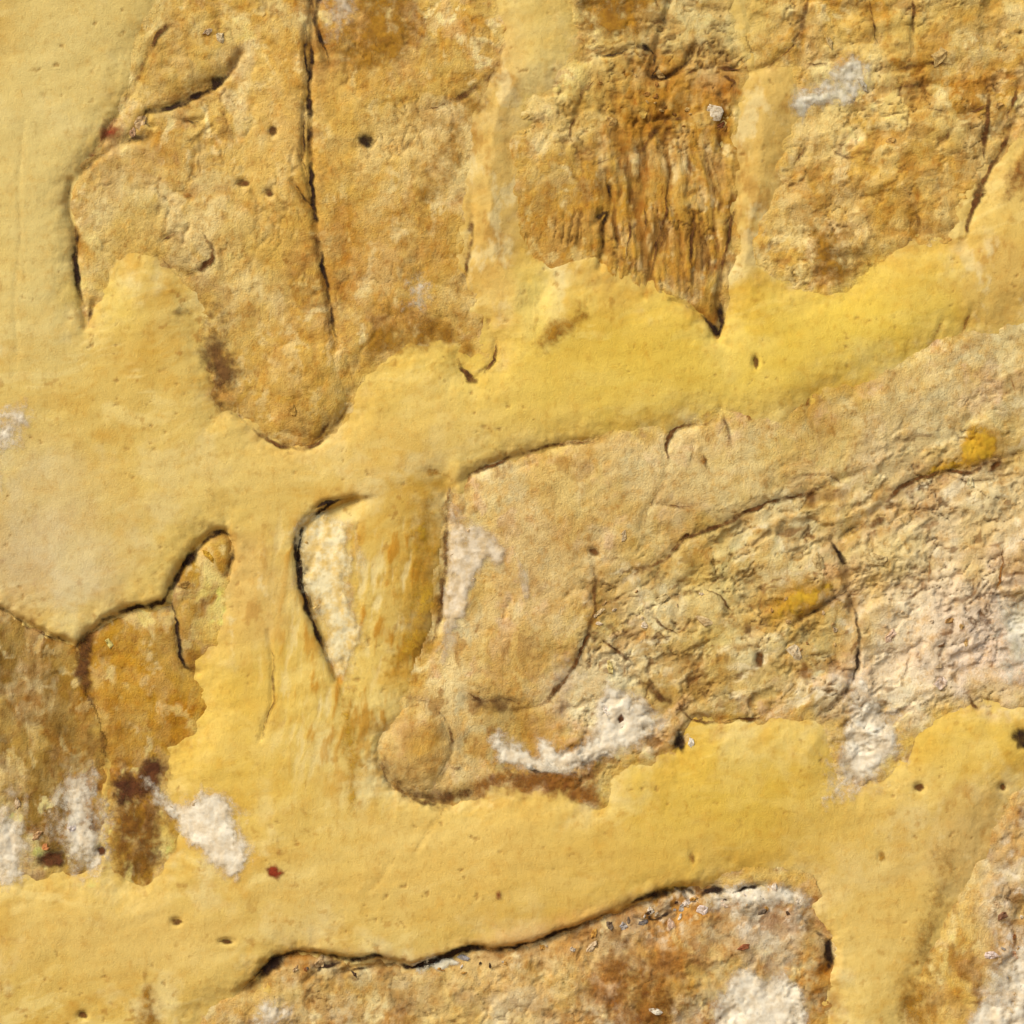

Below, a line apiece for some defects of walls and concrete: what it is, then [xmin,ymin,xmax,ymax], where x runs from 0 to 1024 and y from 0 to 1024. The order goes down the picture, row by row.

spalling [70,0,507,447]
crack [297,0,335,335]
spalling [509,0,1024,339]
water stain [0,807,28,885]
water stain [59,773,107,868]
spalling [0,531,248,887]
peeling [293,512,364,675]
water stain [473,697,509,711]
spalling [200,867,837,1024]
water stain [489,684,663,772]
spalling [377,323,1024,810]
spalling [902,784,1024,1024]